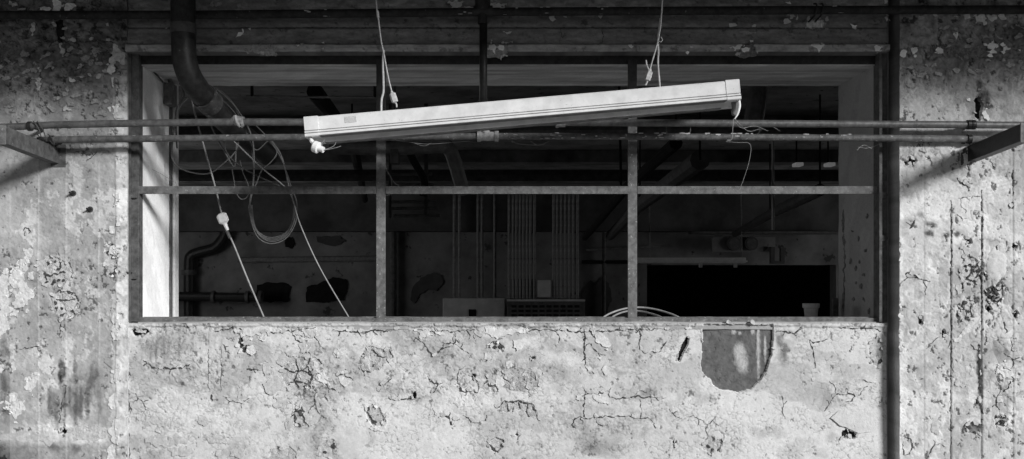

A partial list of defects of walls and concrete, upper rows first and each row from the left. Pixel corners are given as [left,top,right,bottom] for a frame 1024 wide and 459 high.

peeling [0,0,126,119]
peeling [900,14,1024,90]
spalling [966,88,990,120]
peeling [0,362,40,423]
spalling [0,245,82,339]
crack [104,326,496,457]
crack [528,326,719,433]
spalling [677,319,776,395]
crack [776,324,881,411]
crack [900,178,1020,459]